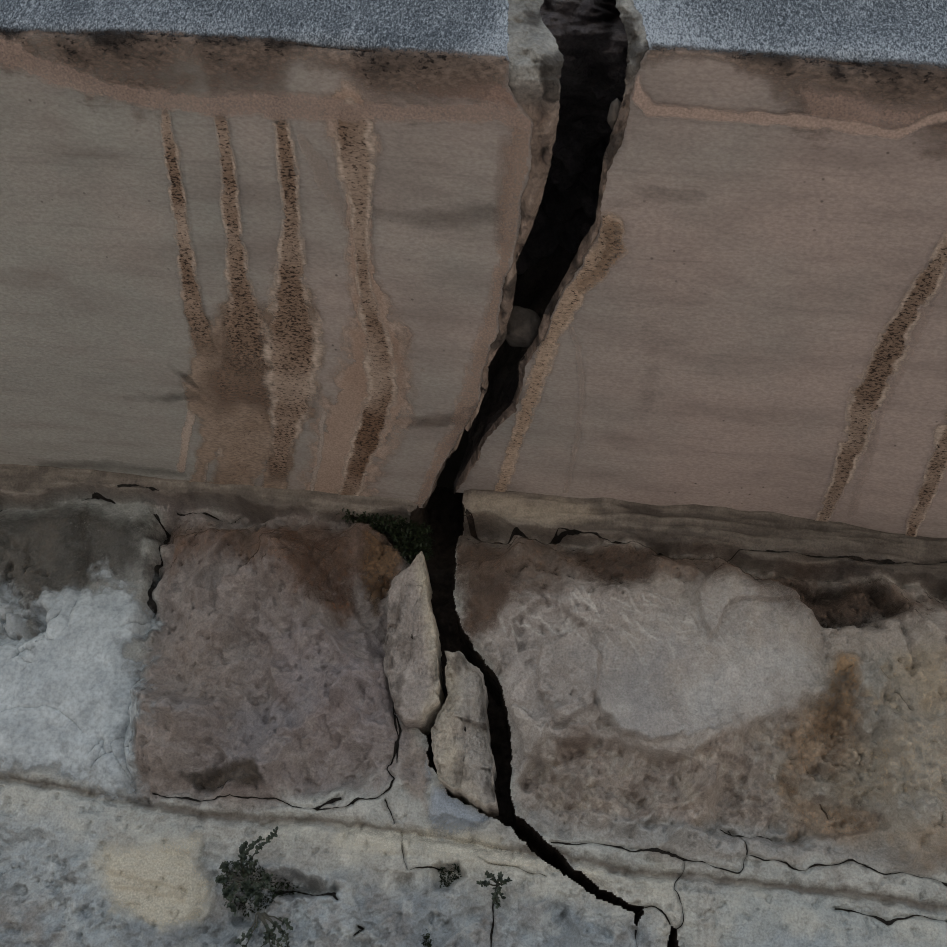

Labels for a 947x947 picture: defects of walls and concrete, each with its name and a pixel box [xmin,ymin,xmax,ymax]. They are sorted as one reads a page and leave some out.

leakage [0,27,530,507]
crack [516,0,628,275]
leakage [632,44,947,155]
leakage [815,234,947,537]
crack [147,486,947,947]